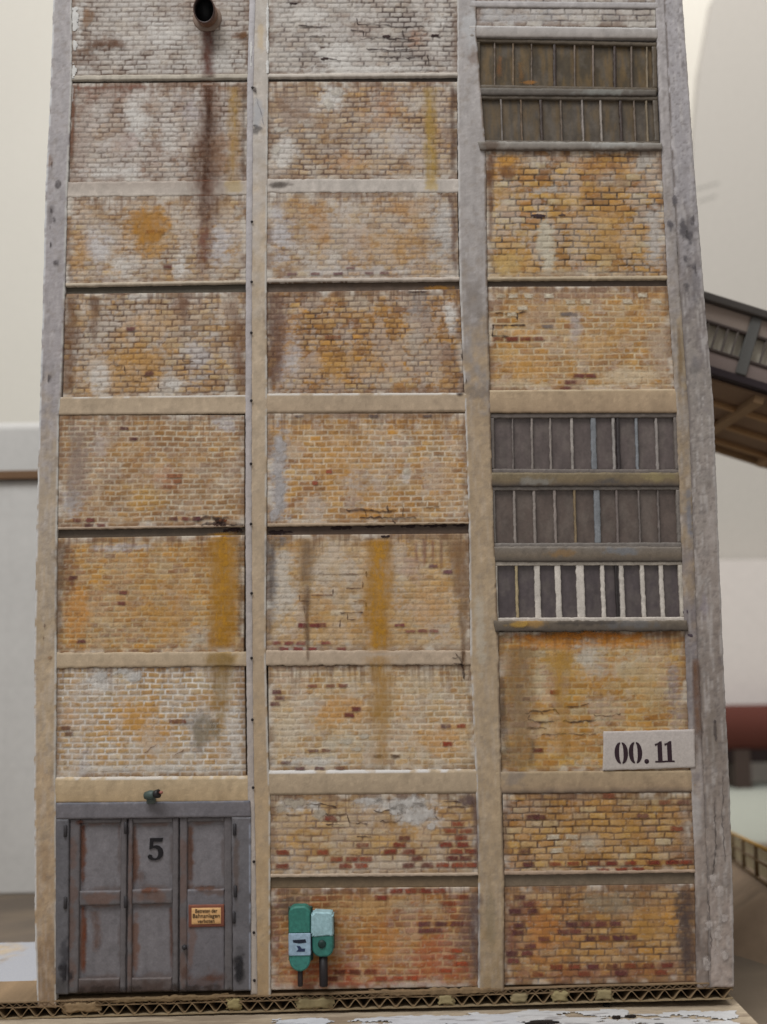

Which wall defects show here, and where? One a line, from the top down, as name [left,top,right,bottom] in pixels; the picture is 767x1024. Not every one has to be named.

rust [198,31,216,259]
crack [346,505,439,523]
crack [526,703,620,735]
peeling [356,795,477,868]